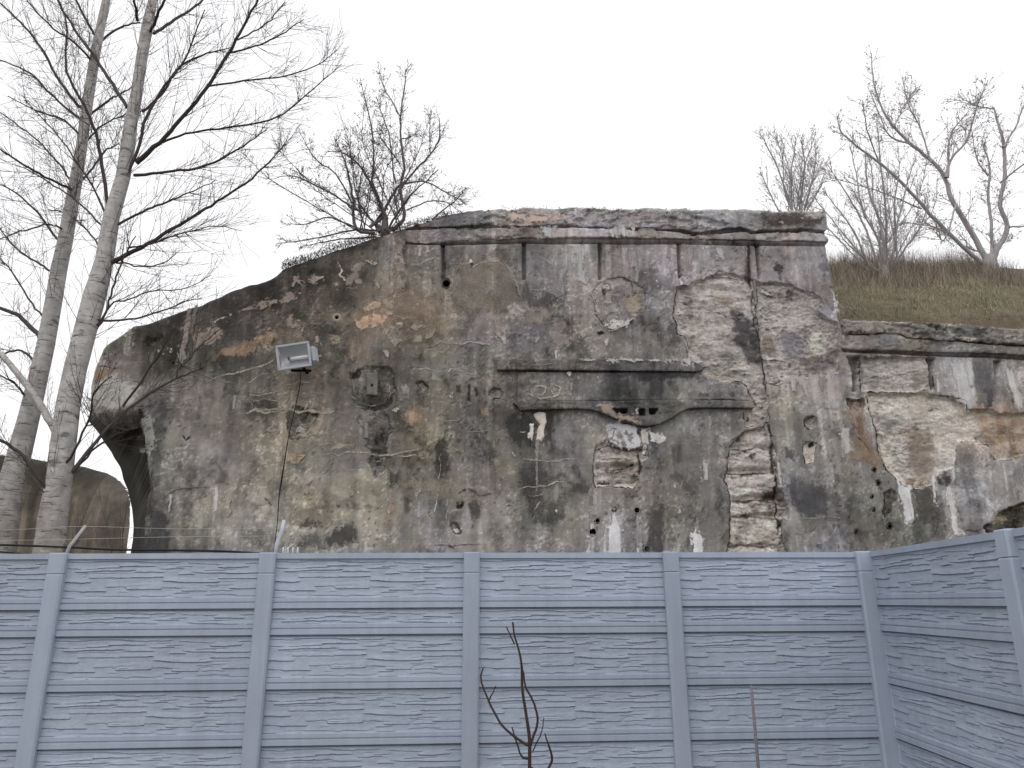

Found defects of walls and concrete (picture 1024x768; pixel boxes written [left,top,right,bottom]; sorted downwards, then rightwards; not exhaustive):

peeling [192,240,439,478]
water stain [387,437,483,518]
water stain [505,411,564,525]
spalling [584,247,840,552]
crack [735,245,767,391]
spalling [846,321,1024,517]
spalling [983,502,1024,533]